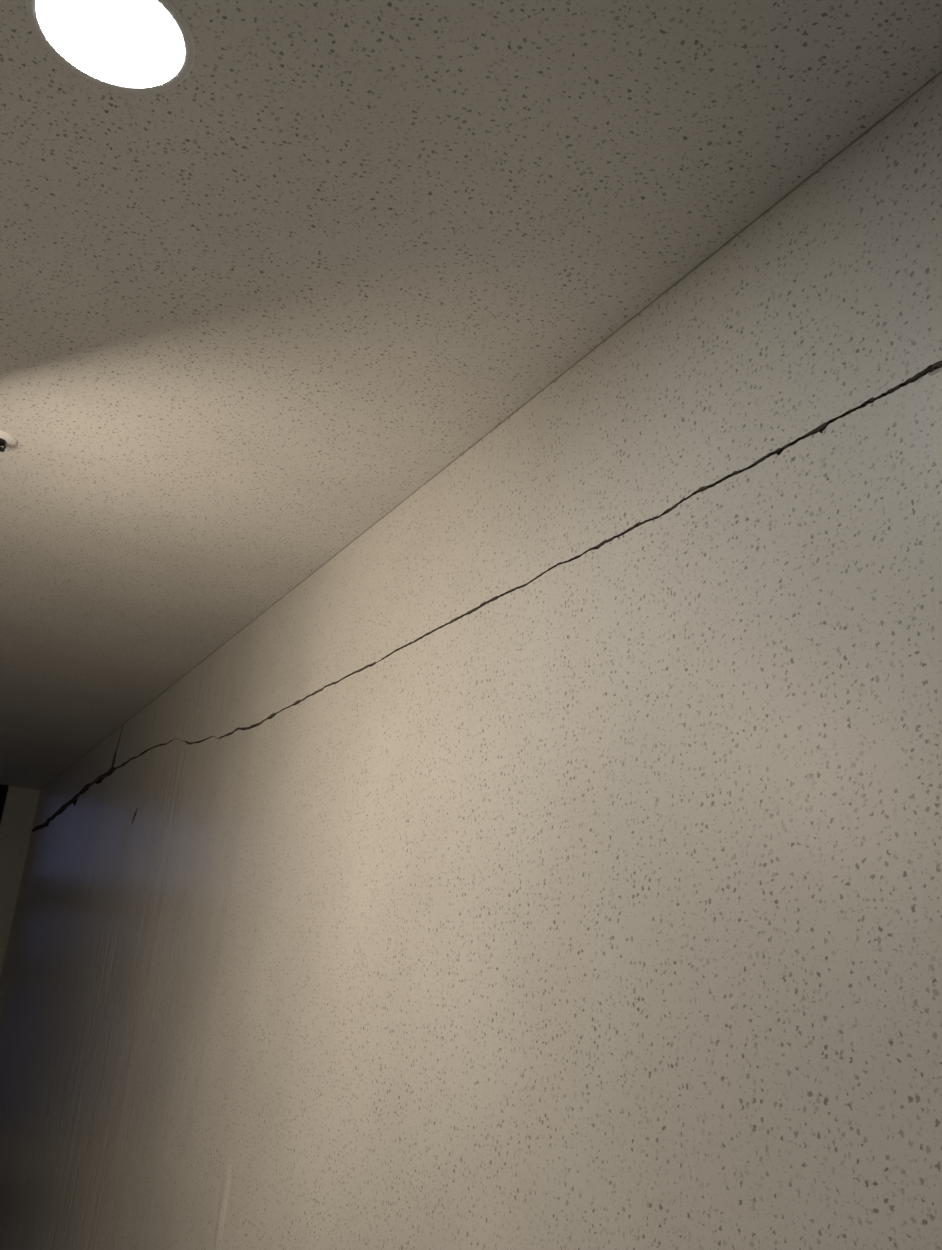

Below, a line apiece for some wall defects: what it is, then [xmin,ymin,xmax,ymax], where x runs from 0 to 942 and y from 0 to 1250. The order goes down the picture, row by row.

crack [32,360,942,832]